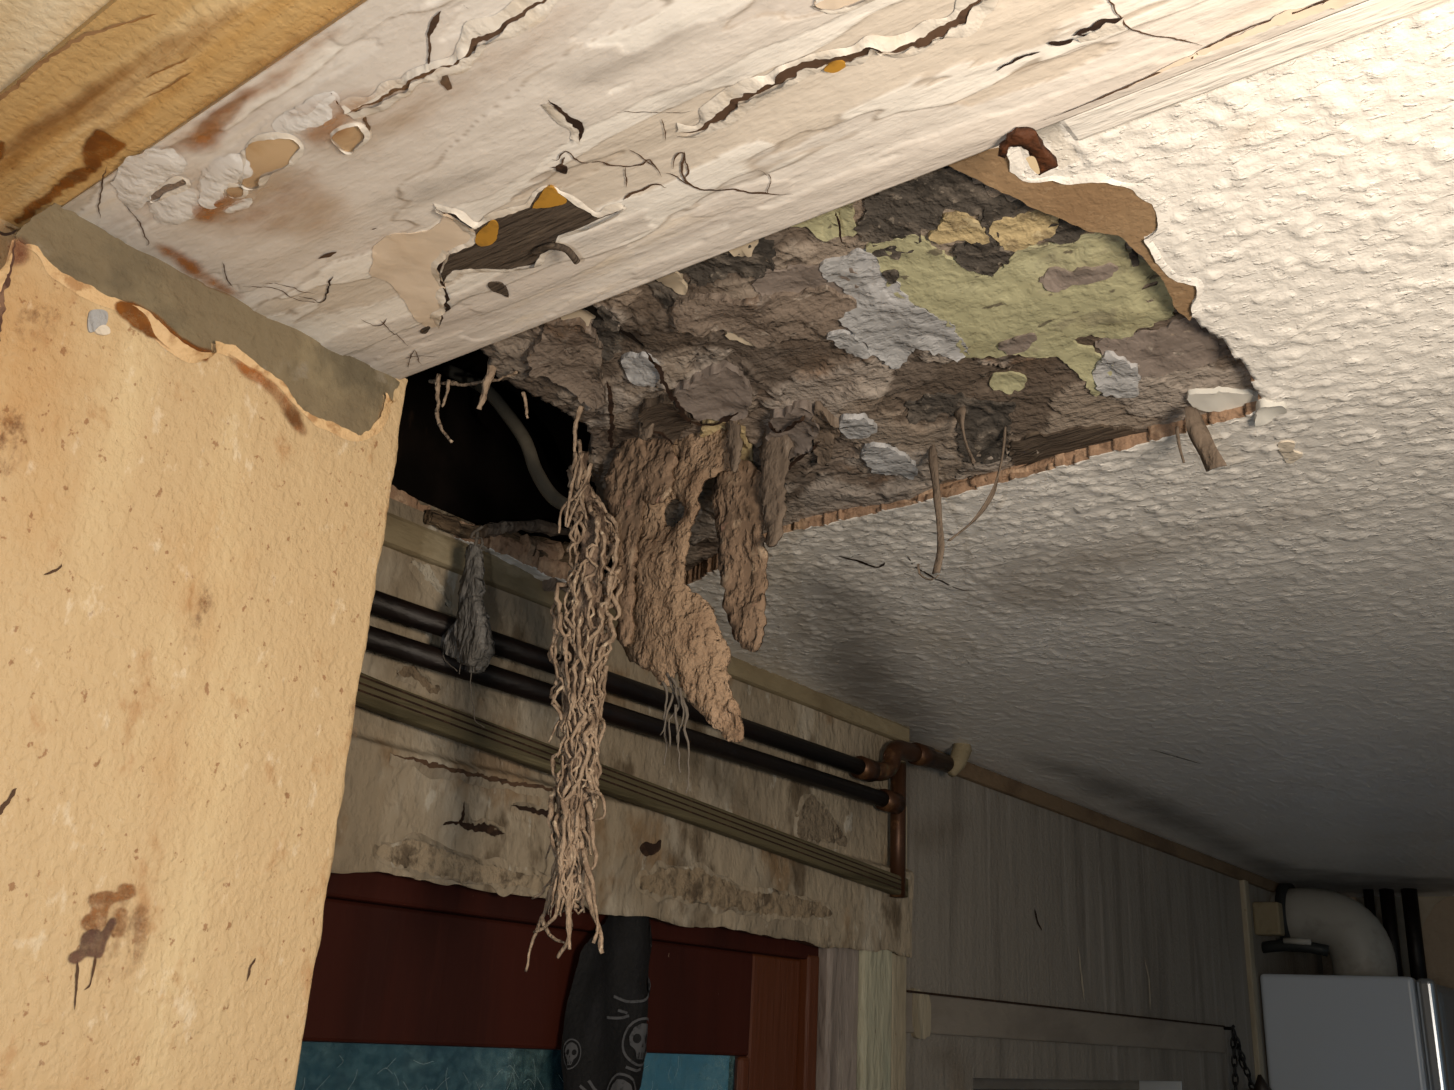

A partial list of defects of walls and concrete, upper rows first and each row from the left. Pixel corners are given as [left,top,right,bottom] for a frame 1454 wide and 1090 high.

crack [331,0,561,142]
crack [541,0,999,200]
crack [997,0,1202,71]
leakage [14,130,126,224]
crack [0,230,16,341]
spalling [14,203,400,442]
peeling [369,185,627,334]
spalling [527,308,606,411]
peeling [1092,318,1230,398]
spalling [621,351,1007,581]
peeling [1175,386,1287,472]
peeling [373,832,578,899]